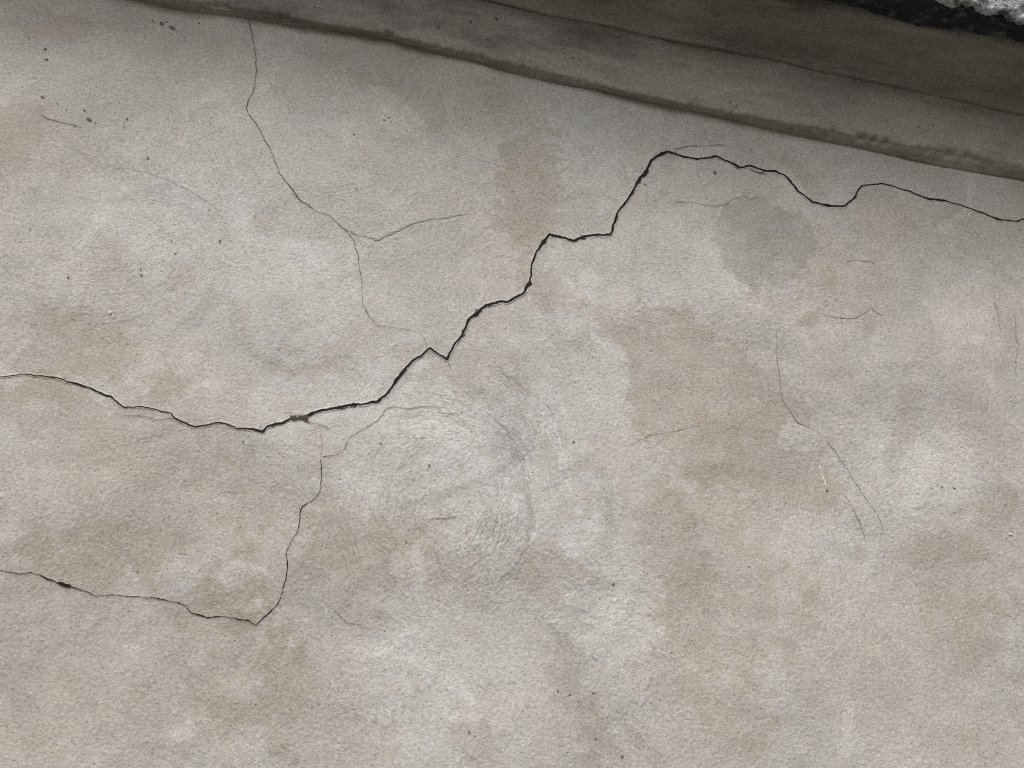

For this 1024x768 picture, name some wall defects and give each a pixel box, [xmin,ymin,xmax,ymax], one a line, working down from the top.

crack [0,20,1024,628]
leakage [479,107,850,768]
leakage [705,147,923,335]